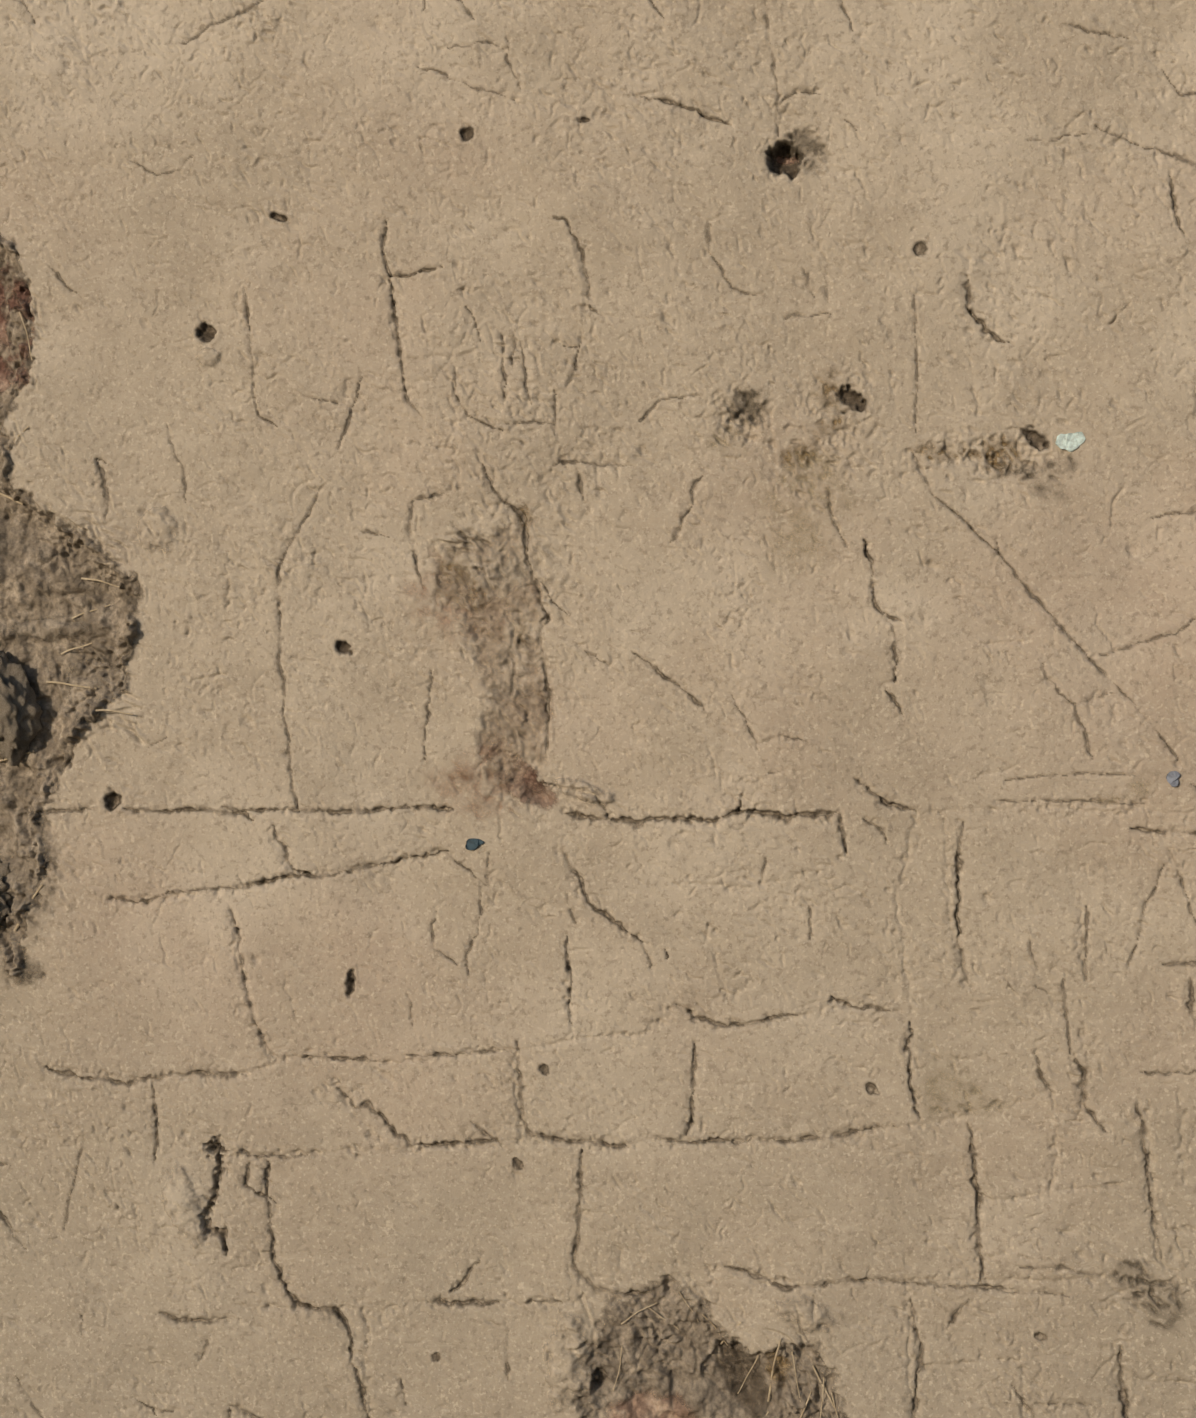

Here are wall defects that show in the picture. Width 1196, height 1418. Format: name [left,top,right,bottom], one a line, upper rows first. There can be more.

flaking render [0,236,141,983]
crack [828,493,902,714]
crack [115,493,490,1041]
crack [545,673,915,853]
crack [302,1004,652,1307]
crack [565,870,669,1021]
crack [667,996,919,1144]
crack [955,822,964,951]
crack [1008,906,1106,1132]
crack [237,1150,370,1418]
flaking render [575,1275,846,1418]
crack [724,1128,1068,1413]